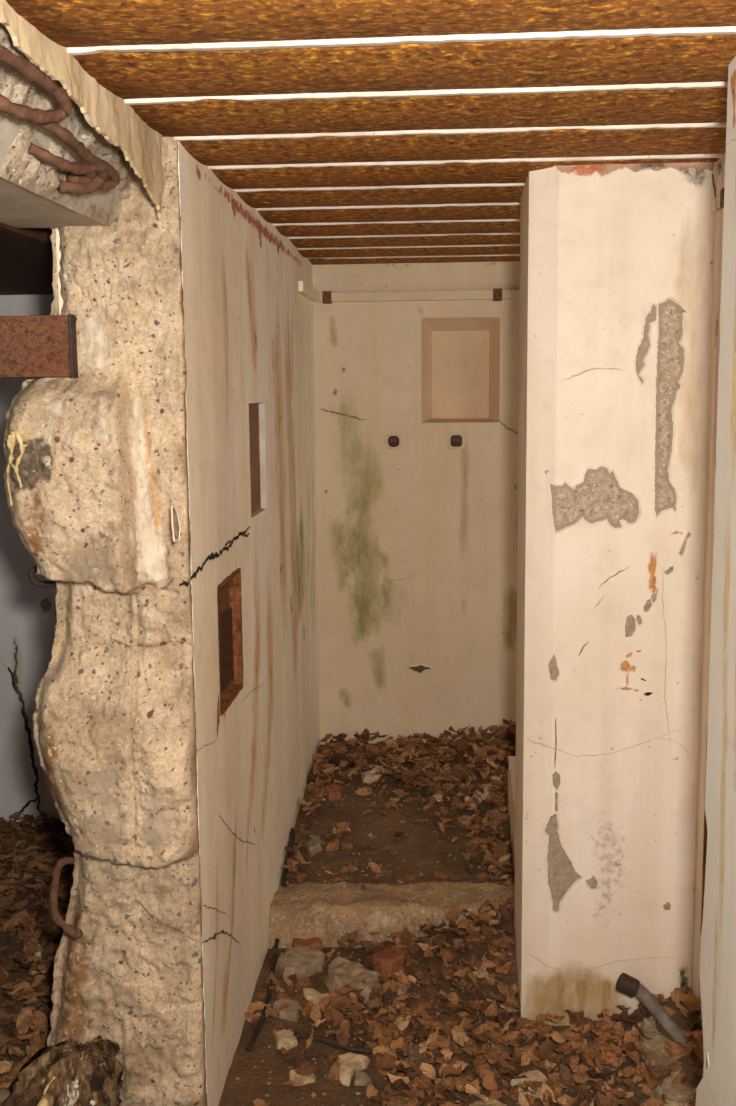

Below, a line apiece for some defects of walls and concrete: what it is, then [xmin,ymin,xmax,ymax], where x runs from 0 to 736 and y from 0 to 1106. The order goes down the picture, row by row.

spalling [0,0,164,227]
spalling [548,297,688,534]
crack [125,526,251,594]
rust [621,650,653,696]
spalling [543,770,599,913]
crack [108,883,241,946]
damp [531,975,616,1026]